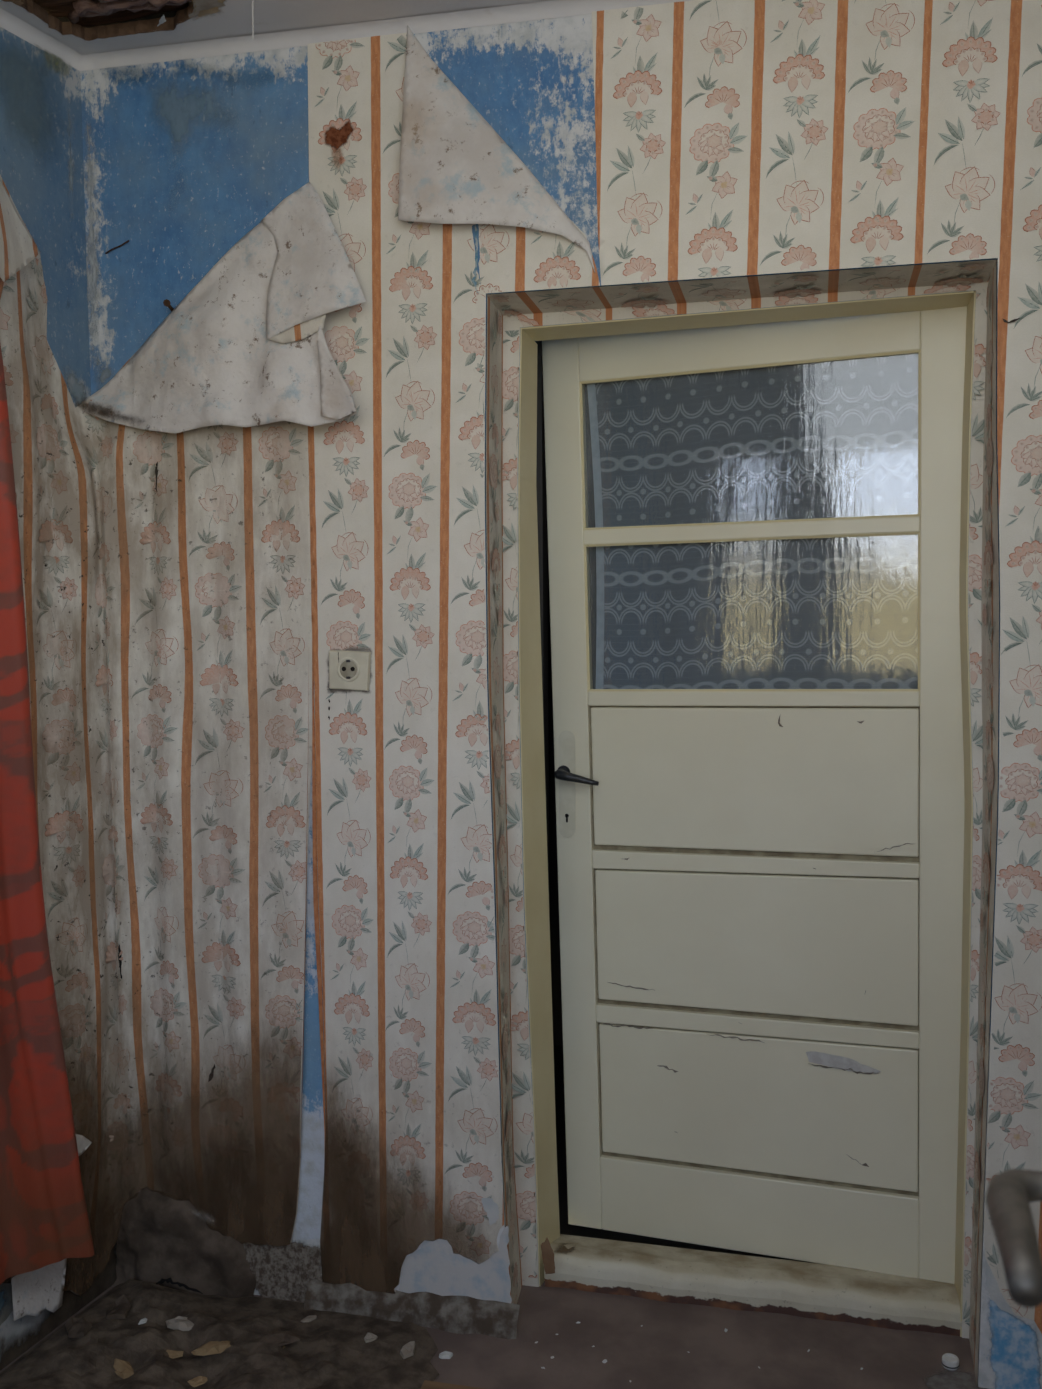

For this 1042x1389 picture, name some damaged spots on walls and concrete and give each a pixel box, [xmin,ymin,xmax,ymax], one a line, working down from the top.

spalling [21,0,194,41]
rust [325,121,353,164]
water stain [0,1039,483,1371]
spalling [304,1198,520,1339]